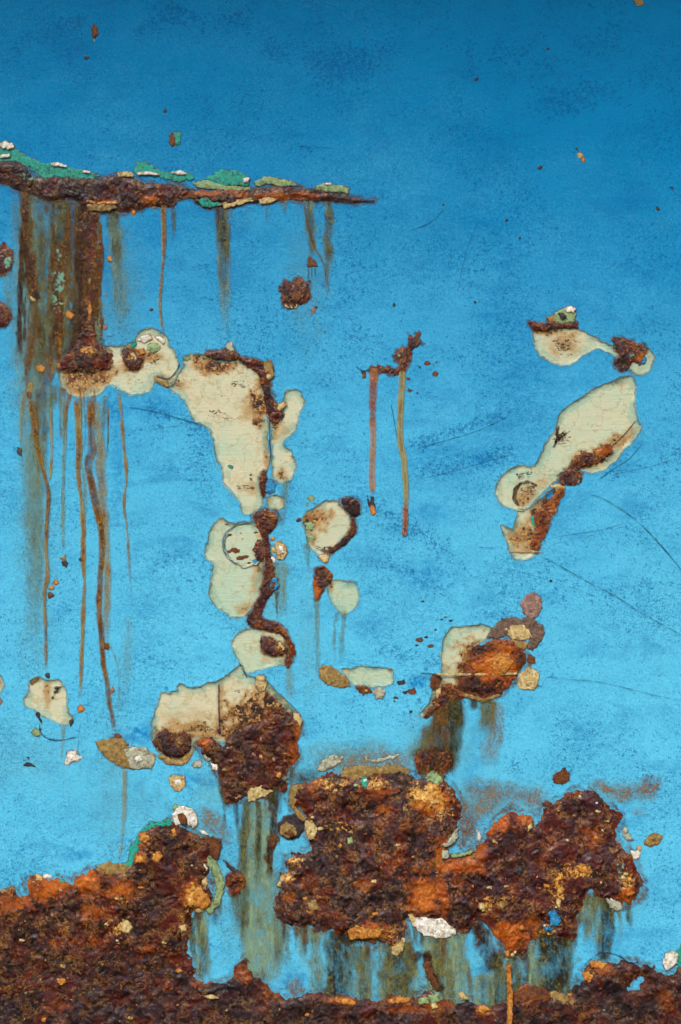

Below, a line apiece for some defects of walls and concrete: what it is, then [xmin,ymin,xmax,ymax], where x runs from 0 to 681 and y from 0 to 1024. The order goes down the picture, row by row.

peeling [58,327,305,804]
corrosion [0,160,375,805]
peeling [296,495,360,623]
corrosion [356,331,439,536]
peeling [494,306,655,560]
peeling [23,677,82,766]
peeling [319,665,416,702]
damp [189,905,220,974]
corrosion [0,747,681,1024]
damp [219,767,573,1008]
damp [578,894,630,960]